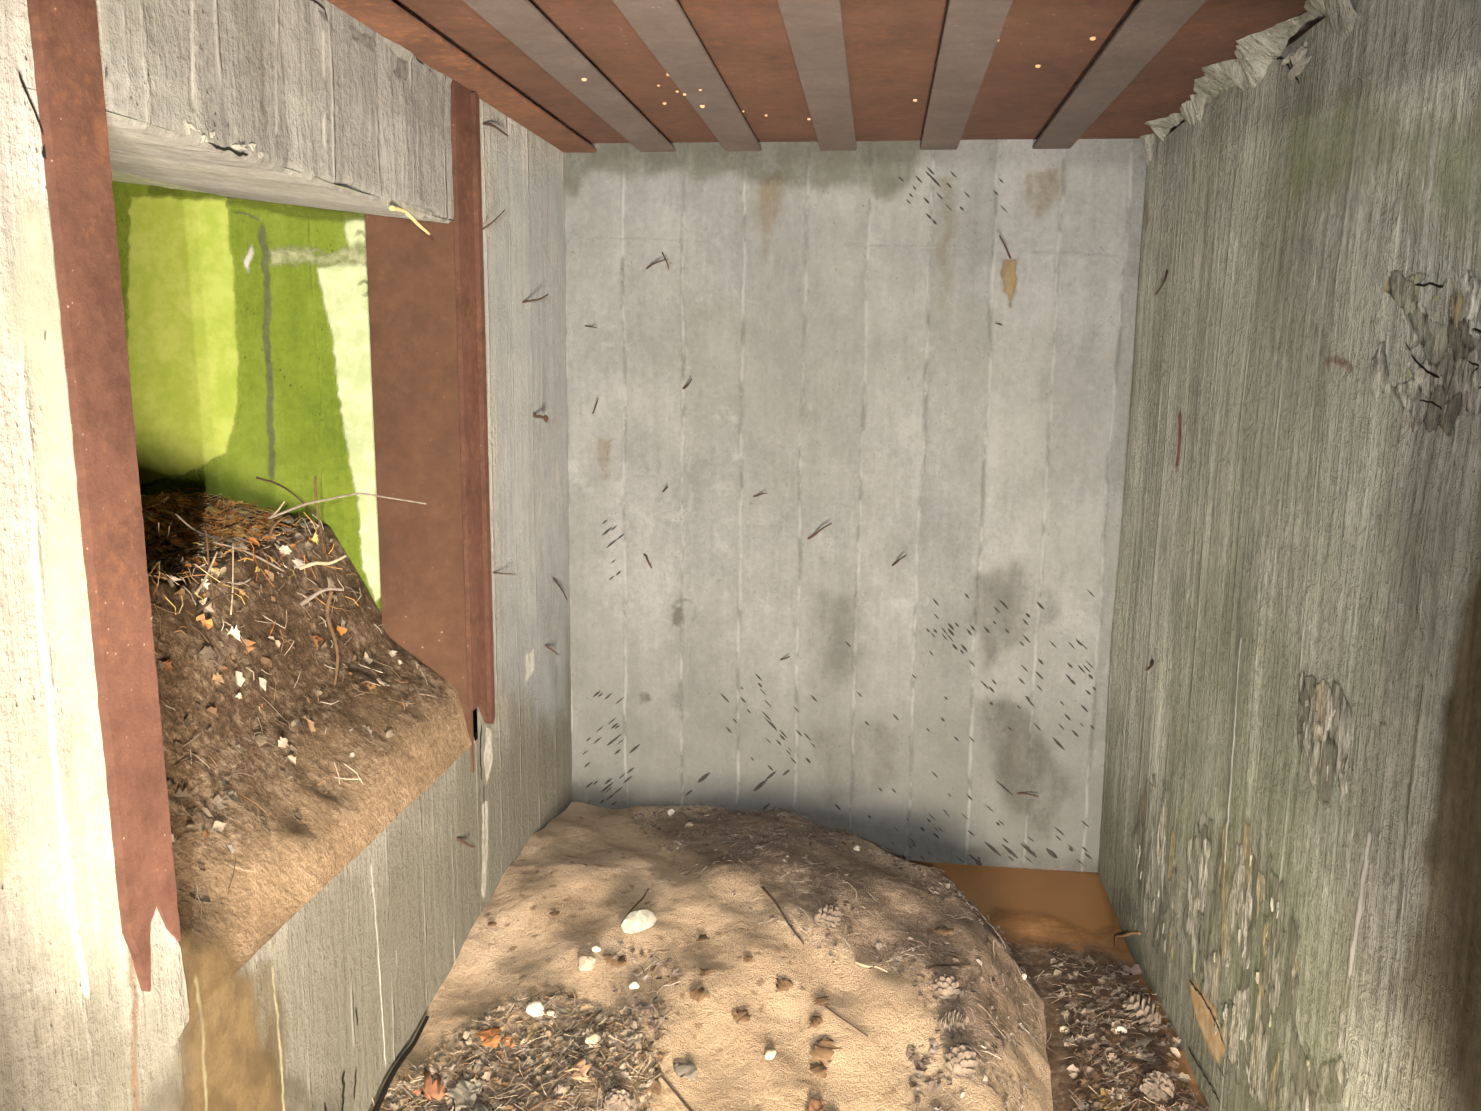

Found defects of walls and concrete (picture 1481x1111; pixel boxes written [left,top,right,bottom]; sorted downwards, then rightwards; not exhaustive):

spalling [1140,0,1358,167]
rust [1001,260,1016,307]
spalling [1371,269,1481,436]
peeling [1297,669,1352,808]
peeling [1132,775,1349,1111]